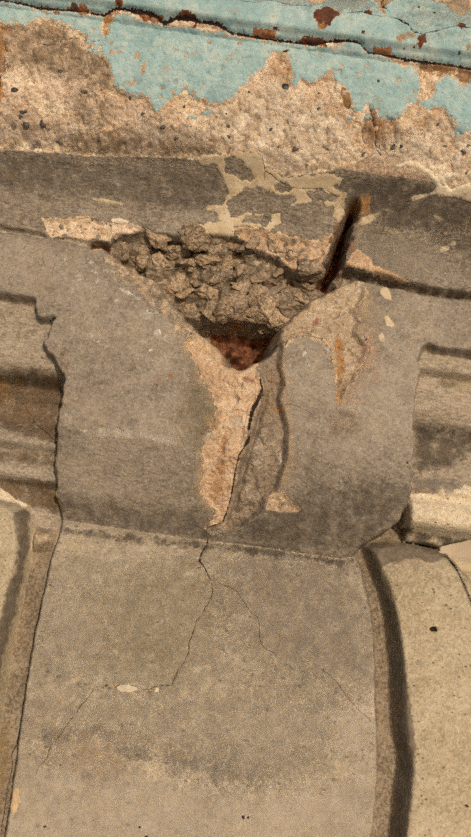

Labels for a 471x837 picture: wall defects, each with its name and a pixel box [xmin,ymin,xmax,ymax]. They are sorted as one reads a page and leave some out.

rust [70,2,93,17]
rust [103,0,123,38]
rust [178,9,197,28]
rust [252,24,279,40]
rust [283,7,340,52]
rust [373,33,427,57]
rust [419,63,471,83]
crack [262,157,354,295]
spalling [0,0,471,531]
peeling [401,485,471,546]
crack [35,378,293,775]